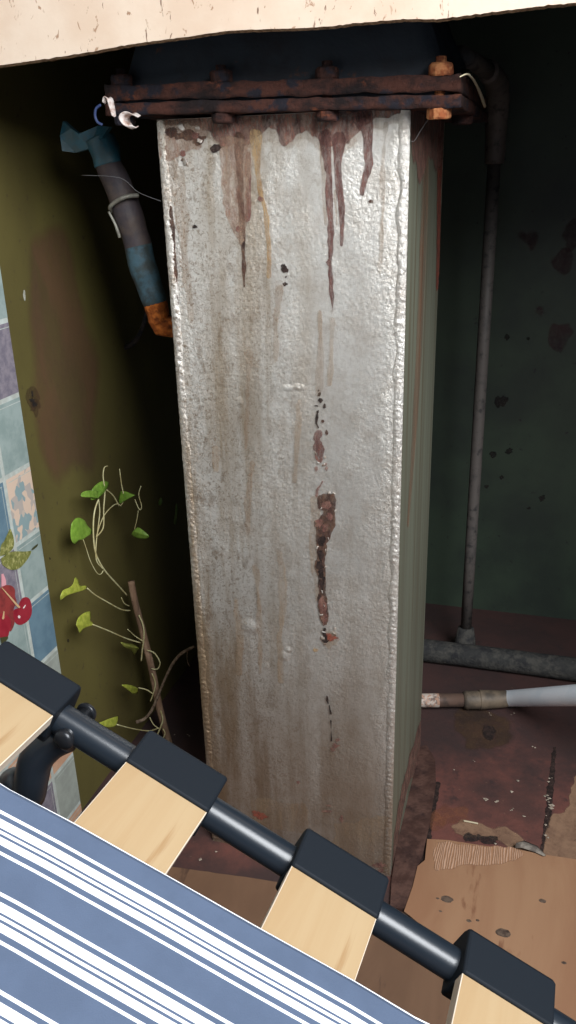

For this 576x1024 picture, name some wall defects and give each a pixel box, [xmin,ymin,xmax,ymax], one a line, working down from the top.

corrosion [158,110,444,308]
crack [540,747,557,852]